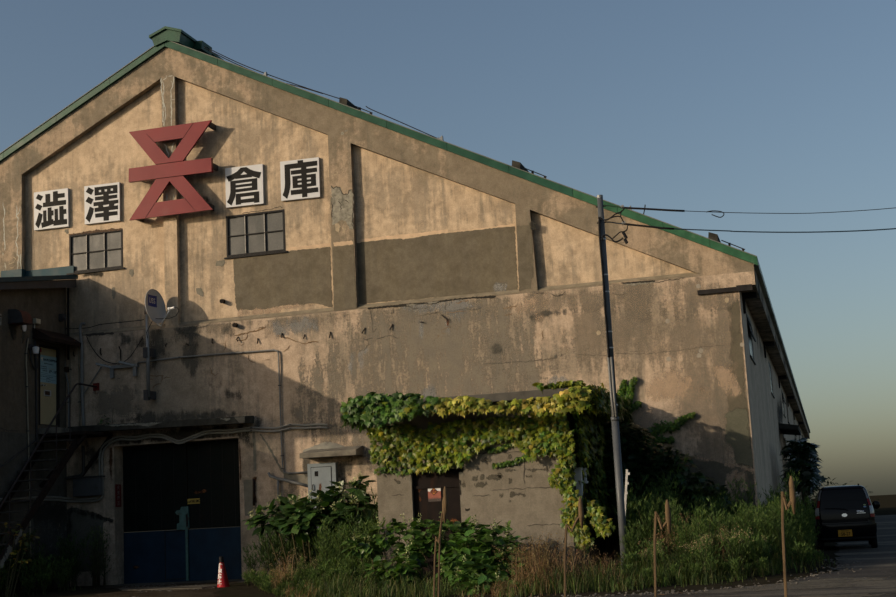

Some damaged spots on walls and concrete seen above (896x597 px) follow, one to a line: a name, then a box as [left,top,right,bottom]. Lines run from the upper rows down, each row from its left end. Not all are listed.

spalling [331,186,354,234]
leakage [121,323,232,377]